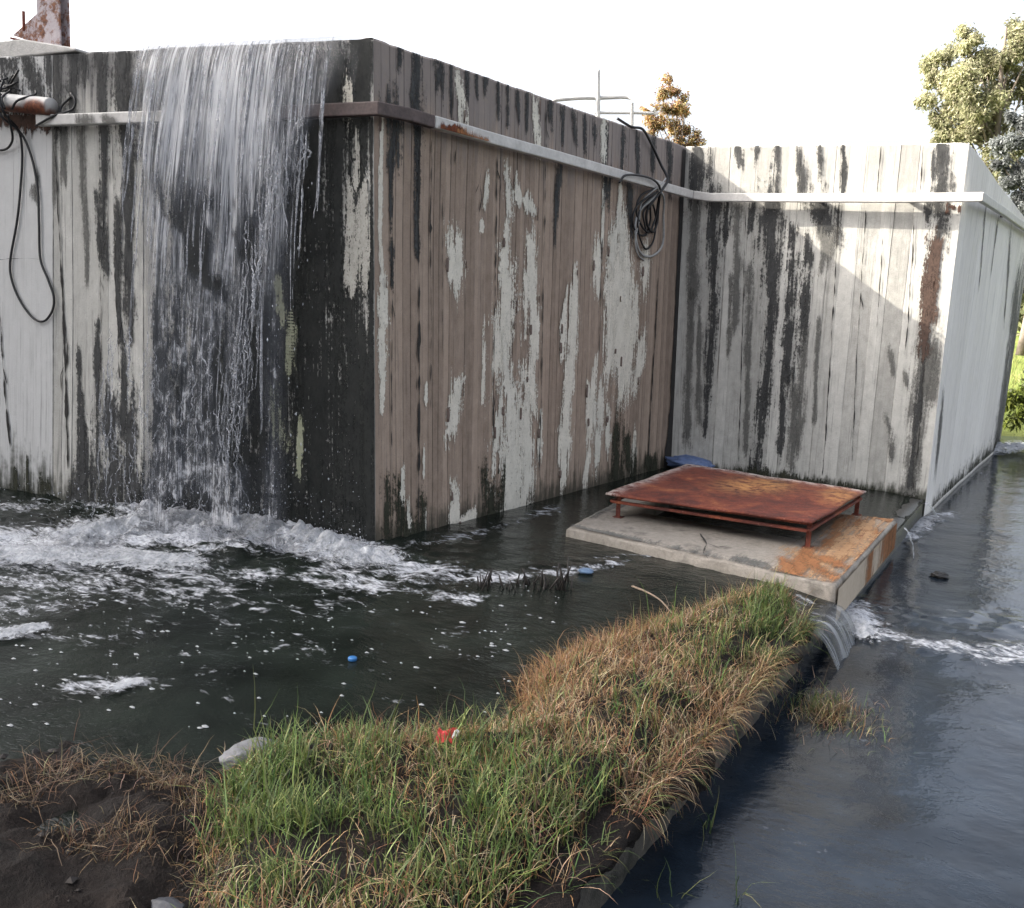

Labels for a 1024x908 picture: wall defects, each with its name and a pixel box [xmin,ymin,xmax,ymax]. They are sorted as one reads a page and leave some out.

peeling [342,67,353,102]
peeling [600,118,608,163]
water stain [0,50,375,542]
peeling [342,117,391,416]
peeling [443,213,467,310]
peeling [479,158,653,512]
water stain [682,145,875,490]
rust [916,220,945,368]
peeling [443,365,466,451]
peeling [448,476,477,524]
rust [775,514,897,585]